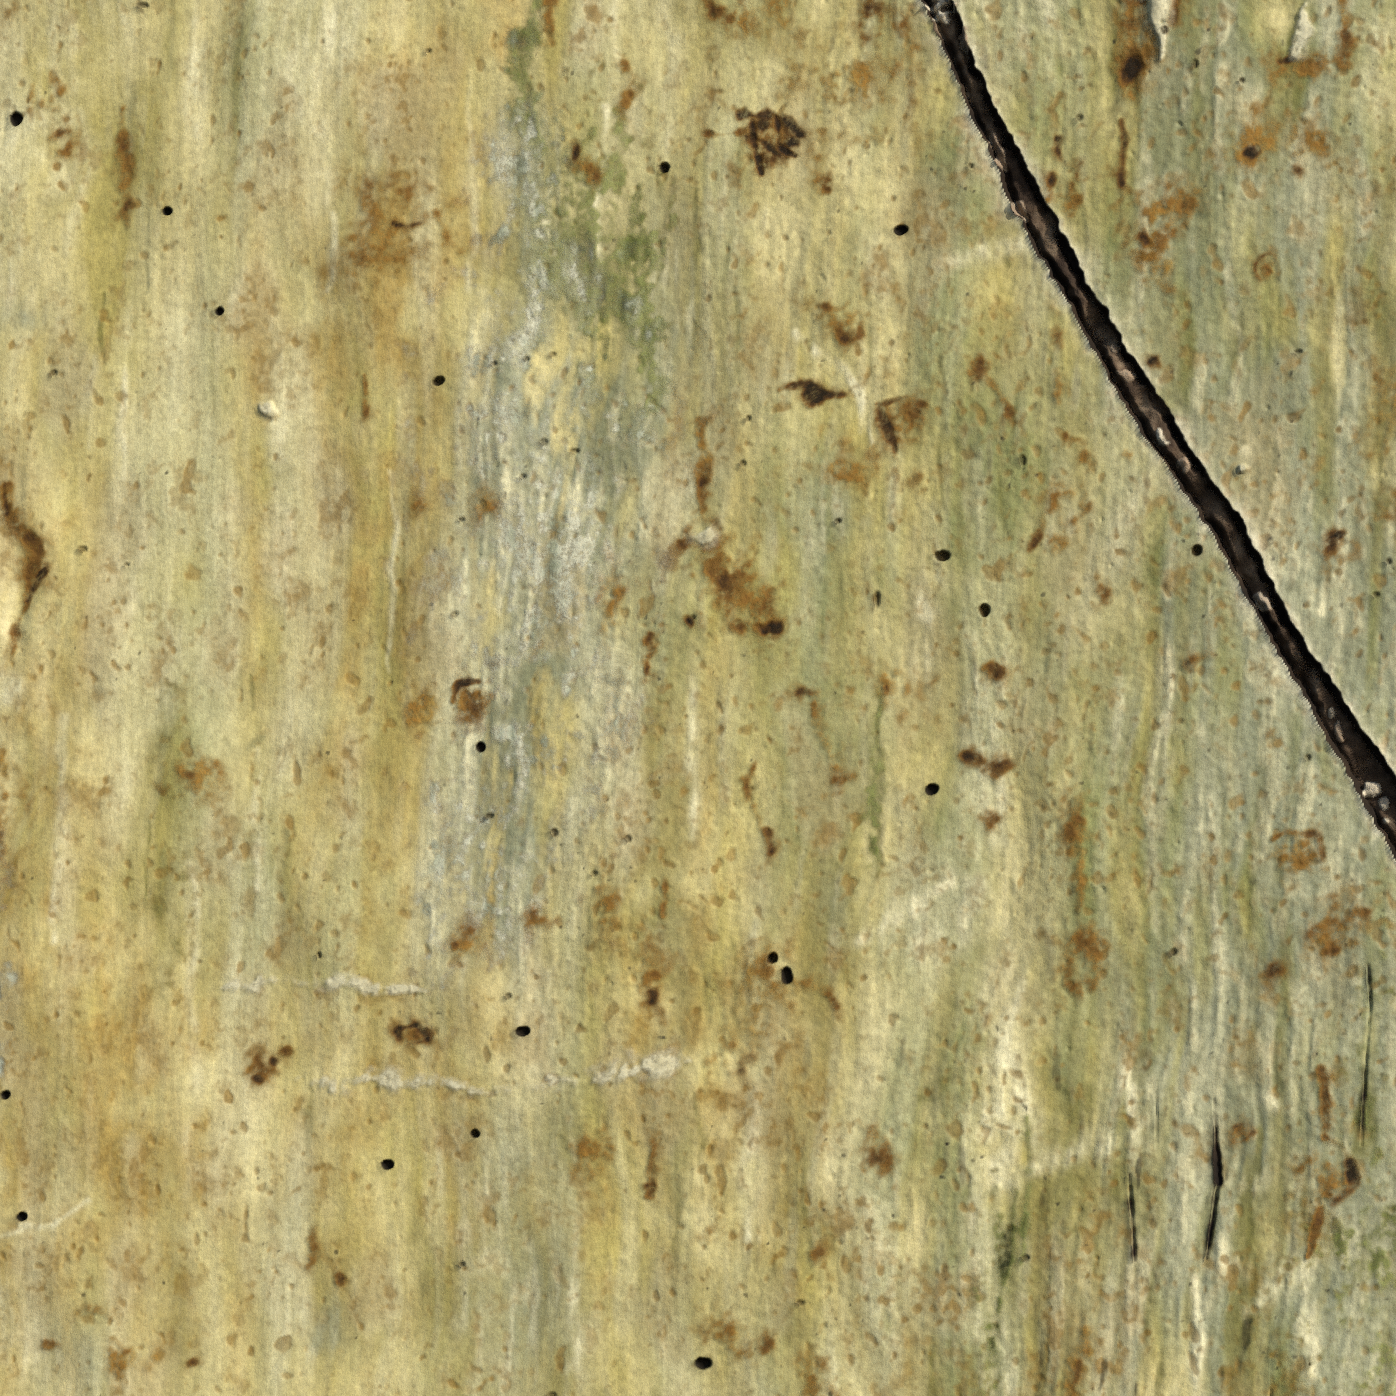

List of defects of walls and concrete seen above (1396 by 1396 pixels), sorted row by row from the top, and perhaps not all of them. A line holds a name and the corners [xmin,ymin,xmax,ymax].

leakage [490,0,546,238]
rust [734,108,805,176]
rust [1115,0,1181,99]
rust [0,481,49,654]
leakage [472,260,547,374]
leakage [467,393,615,695]
leakage [617,197,669,440]
rust [676,416,784,636]
rust [778,379,847,408]
rust [875,394,928,454]
crack [921,0,1396,860]
leakage [430,724,552,955]